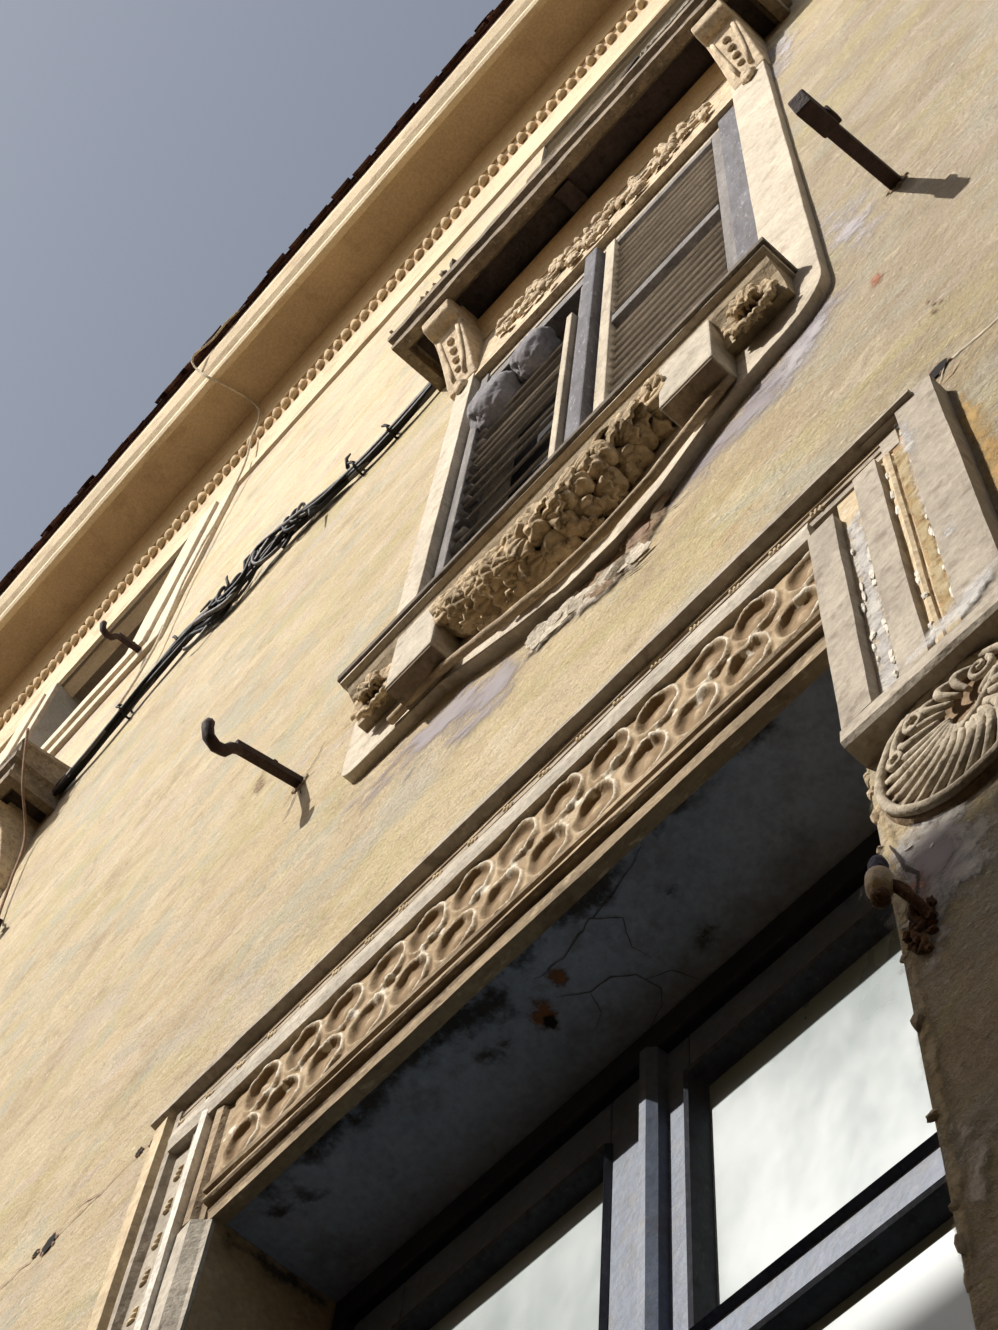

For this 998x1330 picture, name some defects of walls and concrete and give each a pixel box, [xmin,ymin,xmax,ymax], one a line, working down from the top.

spalling [525,489,688,655]
damp [294,987,514,1164]
corrosion [529,1001,559,1030]
crack [534,847,700,1032]
corrosion [902,895,940,955]
peeling [863,770,997,1314]